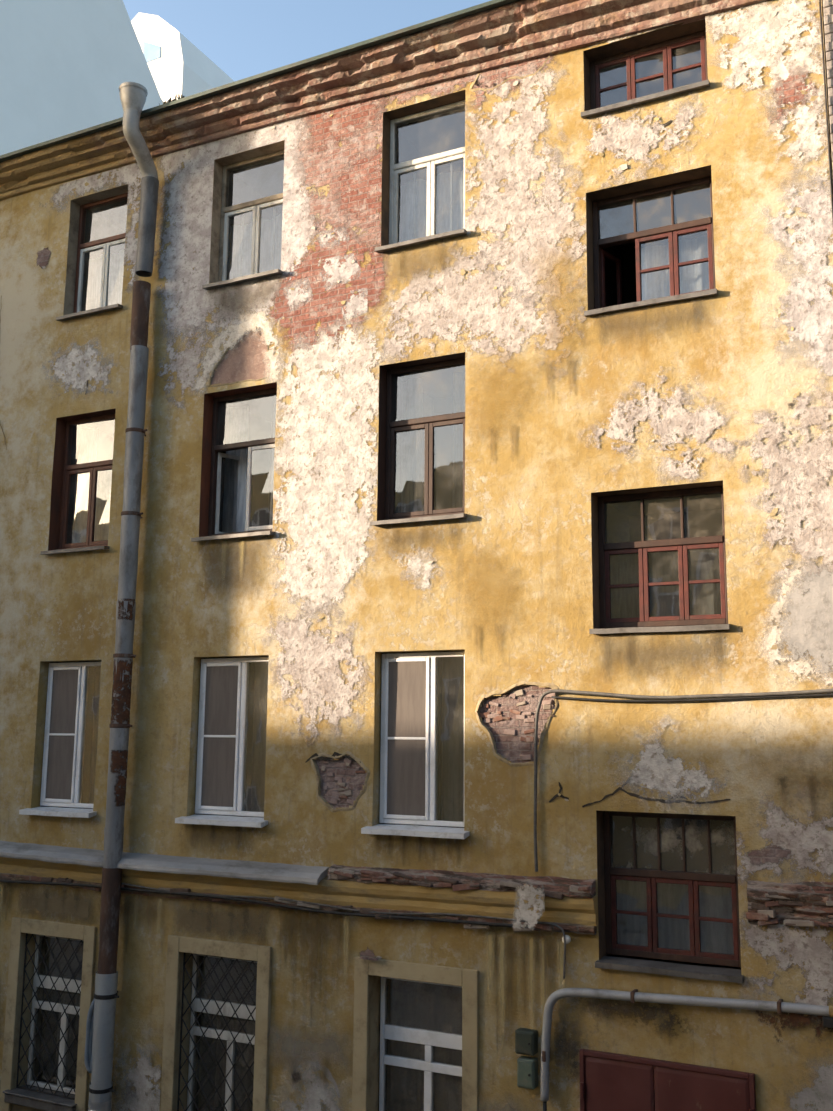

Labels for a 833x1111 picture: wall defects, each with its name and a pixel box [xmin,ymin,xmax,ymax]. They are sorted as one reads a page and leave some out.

peeling [586,101,698,188]
peeling [705,0,833,376]
peeling [155,55,586,737]
peeling [589,375,735,480]
rust [118,598,135,620]
flaking render [762,563,833,688]
rust [110,659,133,724]
flaking render [475,681,560,767]
rust [110,750,128,807]
crack [549,779,731,807]
flaking render [736,802,833,1017]
water stain [488,934,564,1031]